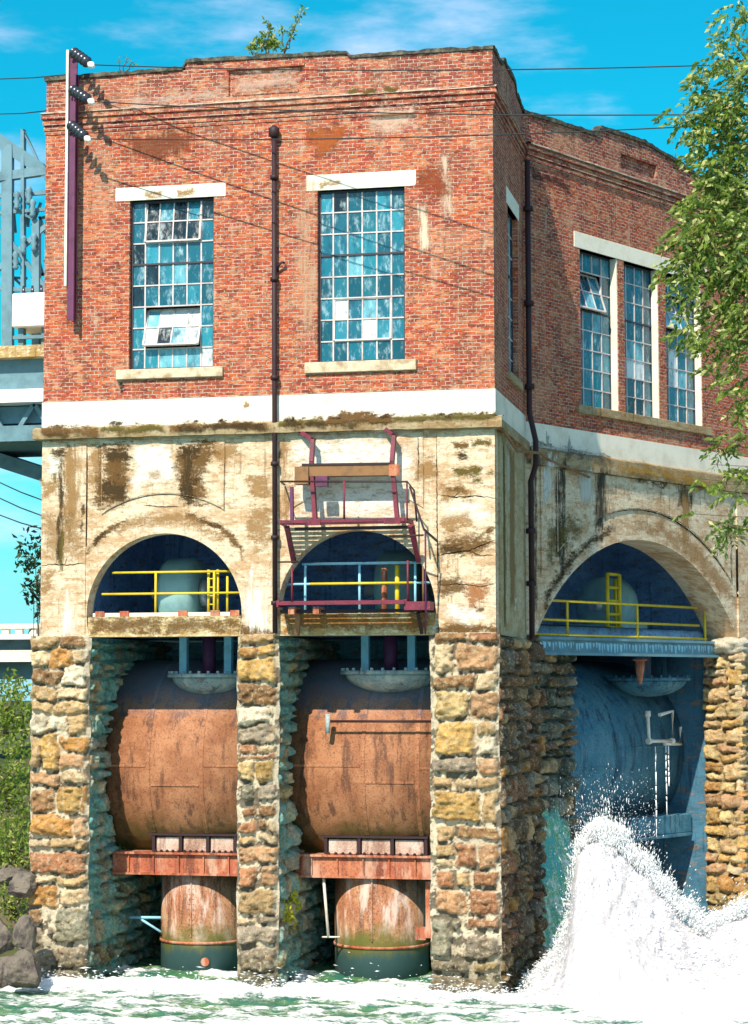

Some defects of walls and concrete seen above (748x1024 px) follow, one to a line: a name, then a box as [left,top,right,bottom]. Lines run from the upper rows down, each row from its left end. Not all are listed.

leakage [40,417,422,593]
crack [418,432,493,629]
leakage [534,452,615,610]